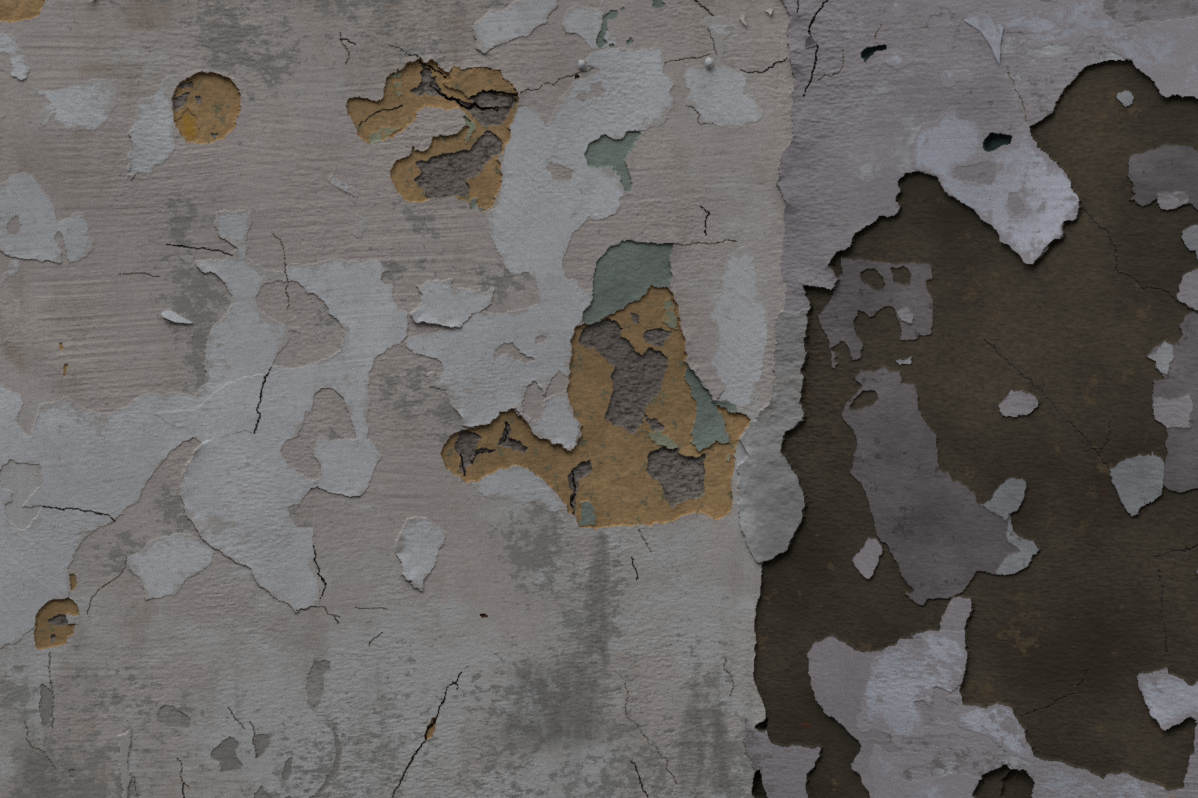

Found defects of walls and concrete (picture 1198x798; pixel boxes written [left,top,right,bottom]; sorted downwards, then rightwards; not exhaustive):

peeling [0,0,118,131]
peeling [126,71,241,180]
crack [664,0,845,97]
peeling [0,210,408,650]
spalling [346,0,1198,798]
crack [392,672,462,797]